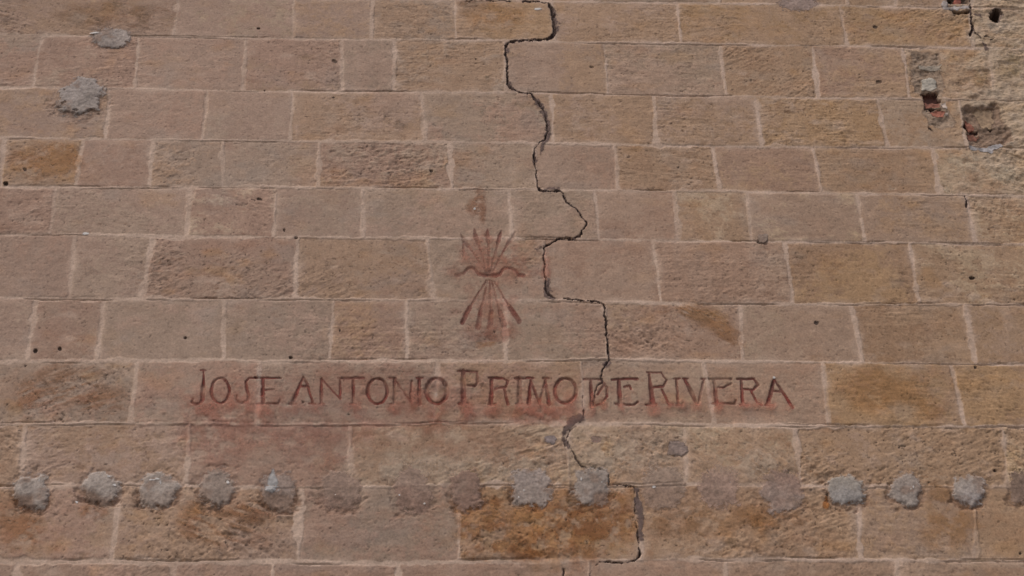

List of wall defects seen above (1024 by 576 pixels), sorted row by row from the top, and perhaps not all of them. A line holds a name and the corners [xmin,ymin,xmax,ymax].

crack [460,0,644,576]
spalling [910,51,1011,154]